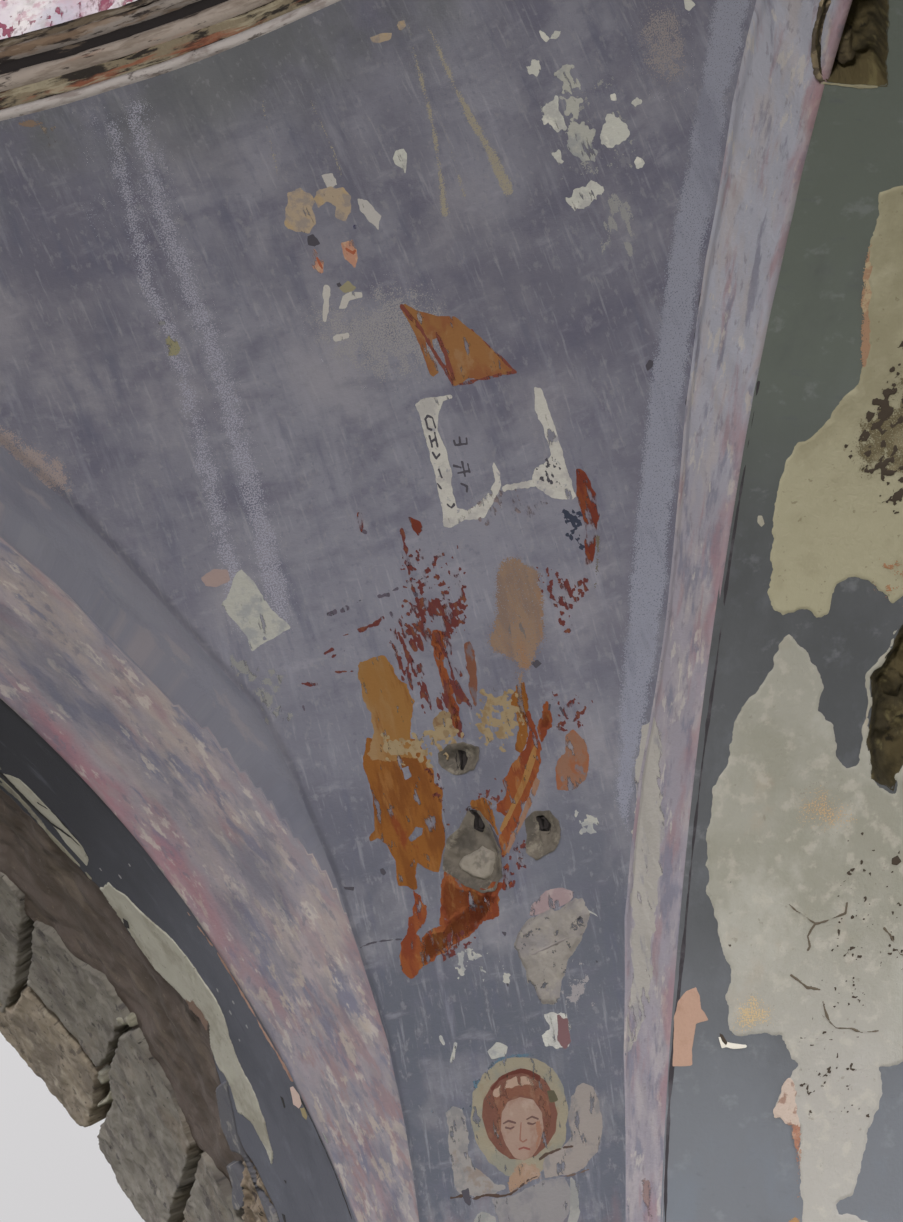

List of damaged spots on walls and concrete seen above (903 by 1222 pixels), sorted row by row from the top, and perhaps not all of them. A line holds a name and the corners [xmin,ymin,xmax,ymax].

peeling [527,59,645,257]
flaking render [757,186,903,618]
flaking render [201,569,293,725]
peeling [0,768,273,1164]
spalling [438,742,480,775]
spalling [443,806,503,893]
peeling [455,948,511,983]
spalling [524,810,561,860]
peeling [673,987,708,1066]
crack [664,381,760,1222]
flaking render [705,625,903,1222]
crack [789,902,879,1033]